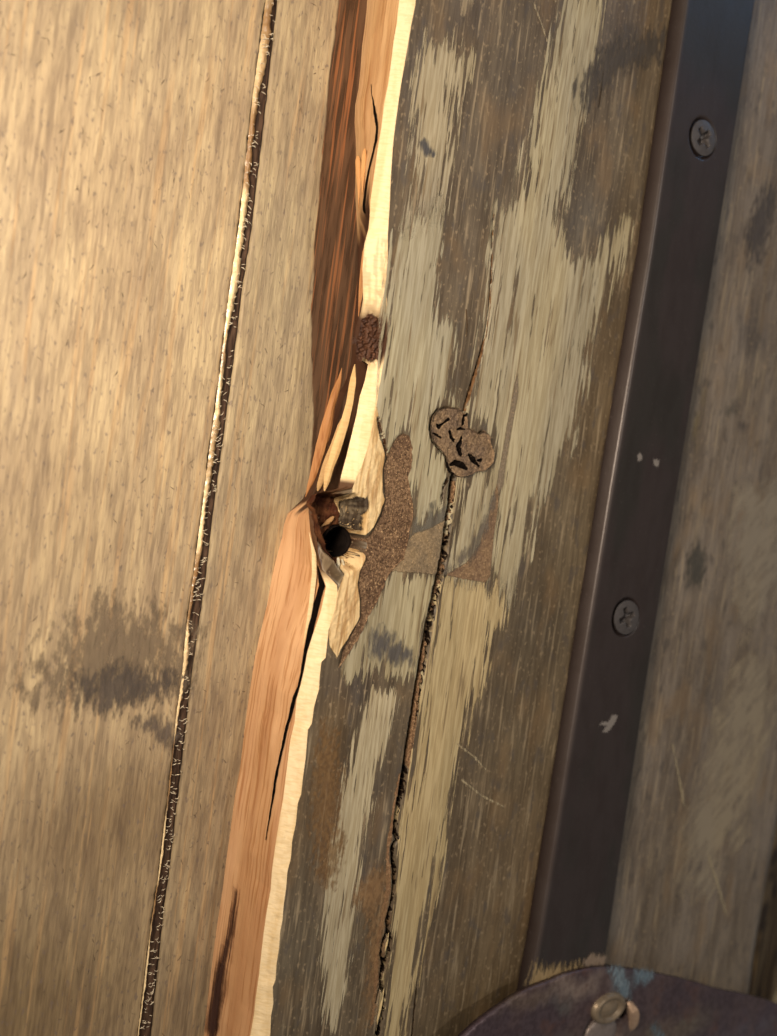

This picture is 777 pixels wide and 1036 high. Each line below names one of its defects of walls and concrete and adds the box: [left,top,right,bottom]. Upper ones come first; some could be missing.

peeling [334,408,385,535]
water stain [18,588,207,716]
peeling [325,540,366,657]
water stain [131,716,179,747]
crack [370,478,456,1036]